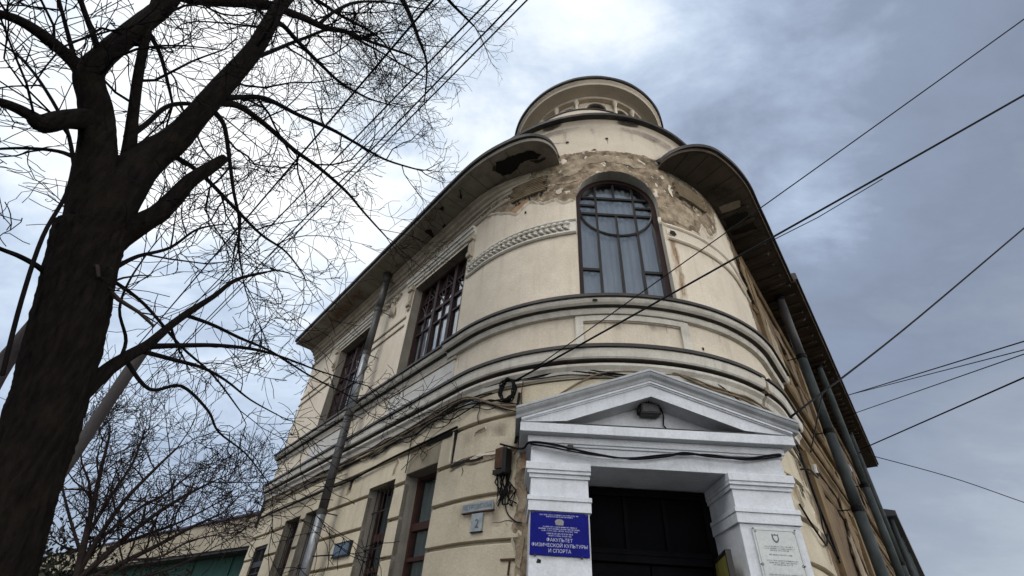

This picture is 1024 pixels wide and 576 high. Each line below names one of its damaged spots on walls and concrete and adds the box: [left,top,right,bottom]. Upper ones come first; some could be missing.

spalling [472,138,803,405]